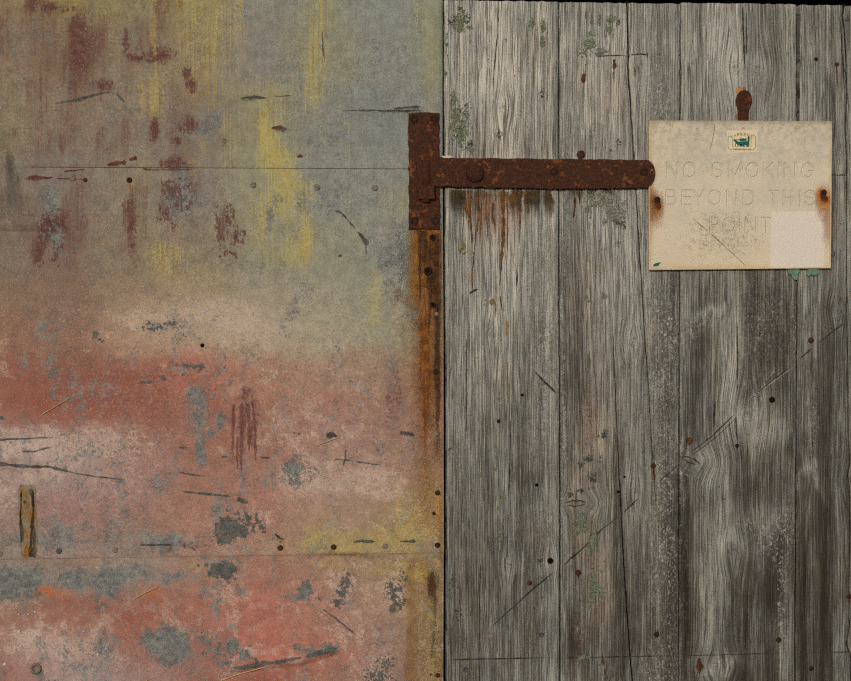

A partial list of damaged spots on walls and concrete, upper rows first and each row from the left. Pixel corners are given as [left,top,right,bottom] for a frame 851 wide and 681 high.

crack [839,4,847,120]
rust [649,189,663,218]
rust [816,188,830,210]
rust [451,189,554,294]
rust [409,229,441,449]
peeling [279,454,322,490]
rust [18,485,37,558]
peeling [213,507,284,546]
crack [613,355,632,681]
peeling [0,563,148,614]
peeling [197,560,237,584]
peeling [134,622,255,671]